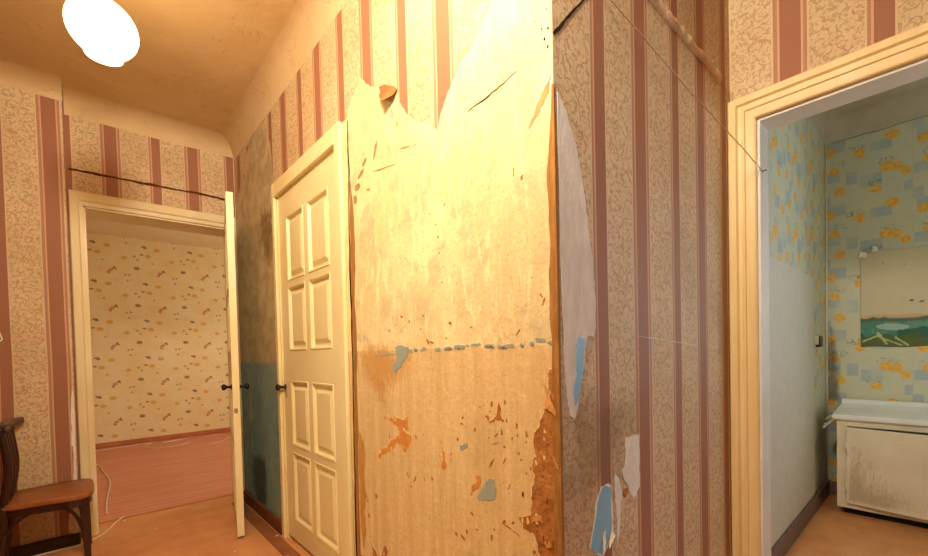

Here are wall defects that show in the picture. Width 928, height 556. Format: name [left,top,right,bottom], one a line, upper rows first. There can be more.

crack [553,0,584,36]
crack [470,72,515,110]
flaking render [353,140,395,204]
leakage [261,214,272,265]
peeling [374,328,552,373]
peeling [378,415,424,461]
peeling [439,438,468,471]
flaking render [479,368,560,556]
peeling [470,475,496,501]